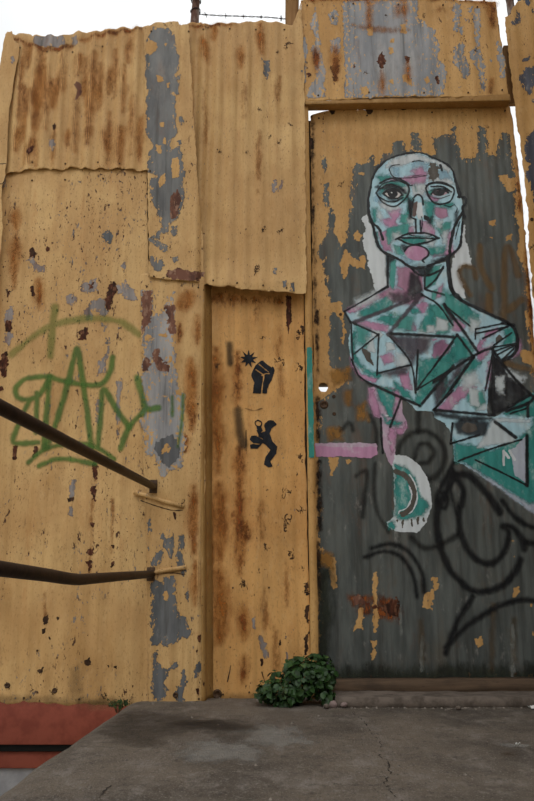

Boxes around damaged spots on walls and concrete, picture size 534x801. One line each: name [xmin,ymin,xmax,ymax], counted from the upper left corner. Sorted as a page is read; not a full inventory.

peeling [300,0,507,99]
peeling [519,56,534,103]
peeling [144,26,205,282]
peeling [101,230,113,244]
peeling [65,262,187,479]
peeling [317,126,534,674]
corrosion [212,448,249,541]
peeling [147,519,201,701]
corrosion [349,594,400,620]